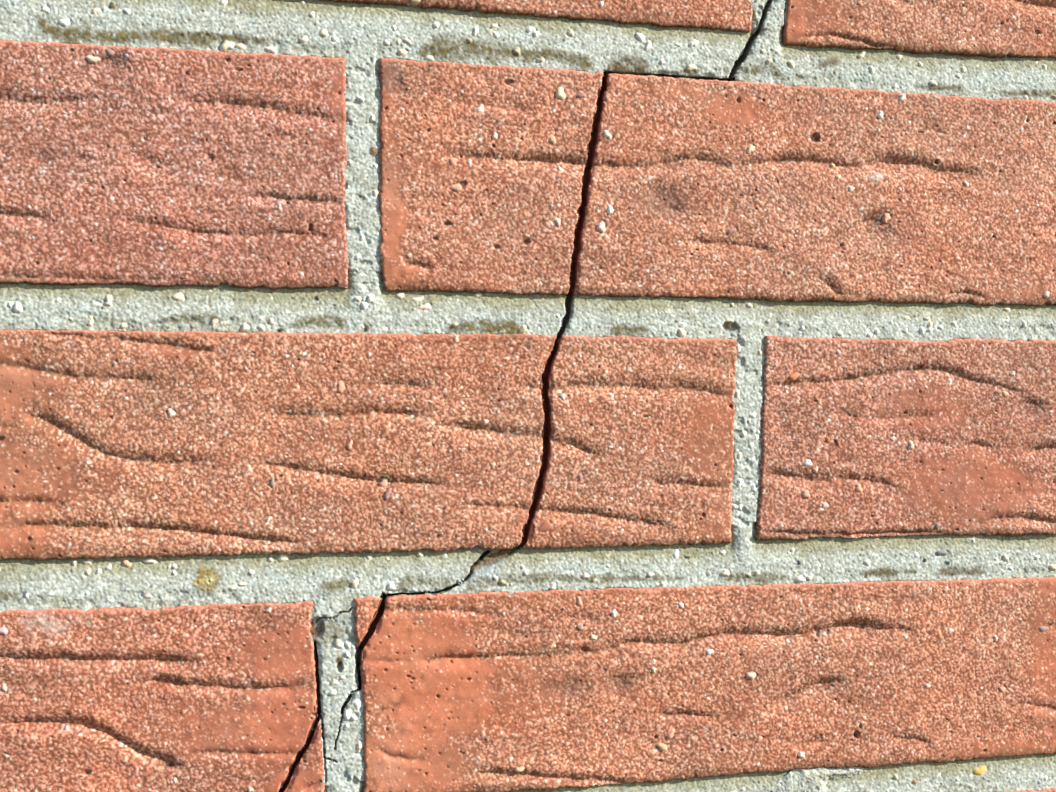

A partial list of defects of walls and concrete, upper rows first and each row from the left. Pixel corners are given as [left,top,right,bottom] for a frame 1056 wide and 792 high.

crack [516,0,786,550]
crack [279,550,490,792]